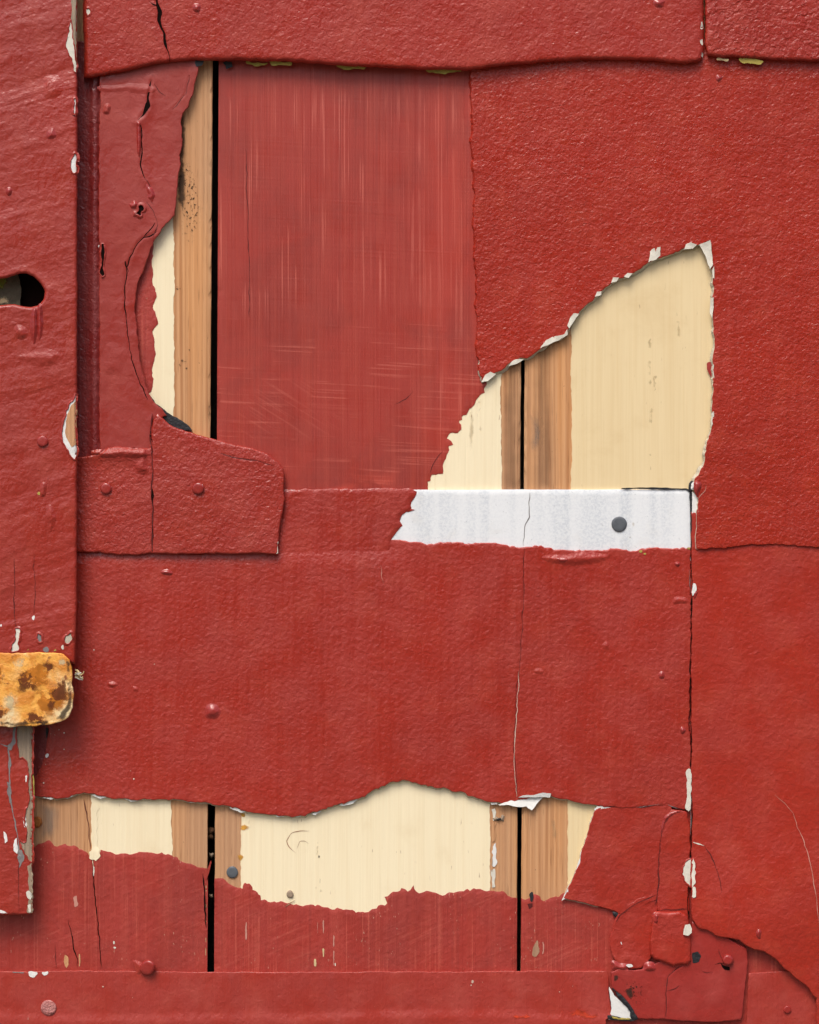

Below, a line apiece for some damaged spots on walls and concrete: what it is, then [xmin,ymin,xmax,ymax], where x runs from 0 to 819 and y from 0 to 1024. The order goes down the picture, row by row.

crack [152,0,170,59]
peeling [649,247,660,262]
peeling [684,240,714,278]
crack [124,81,189,552]
peeling [541,313,579,348]
peeling [60,393,79,461]
peeling [151,397,192,431]
crack [513,496,530,794]
corrosion [0,661,71,726]
crack [617,550,722,920]
peeling [4,726,35,913]
peeling [607,976,641,1022]